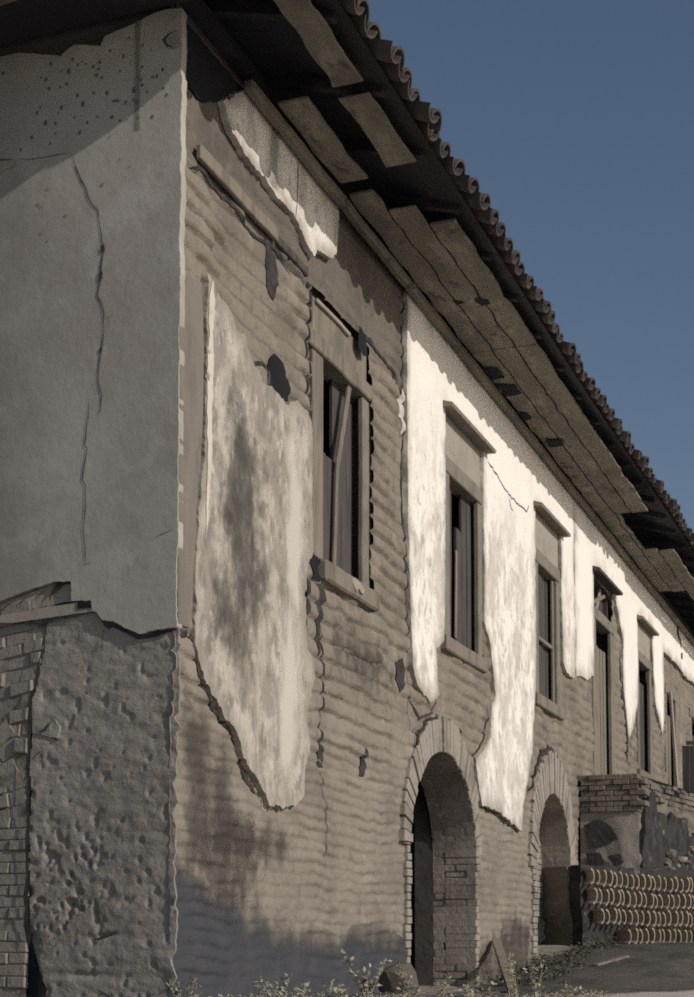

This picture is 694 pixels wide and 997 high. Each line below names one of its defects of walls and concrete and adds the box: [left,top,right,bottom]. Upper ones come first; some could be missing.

crack [26,152,111,565]
flaking render [0,581,91,614]
water stain [219,426,263,652]
water stain [279,433,304,777]
flaking render [162,20,491,951]
crack [489,463,529,512]
flaking render [611,596,638,774]
flaking render [651,655,694,789]
water stain [168,723,407,997]